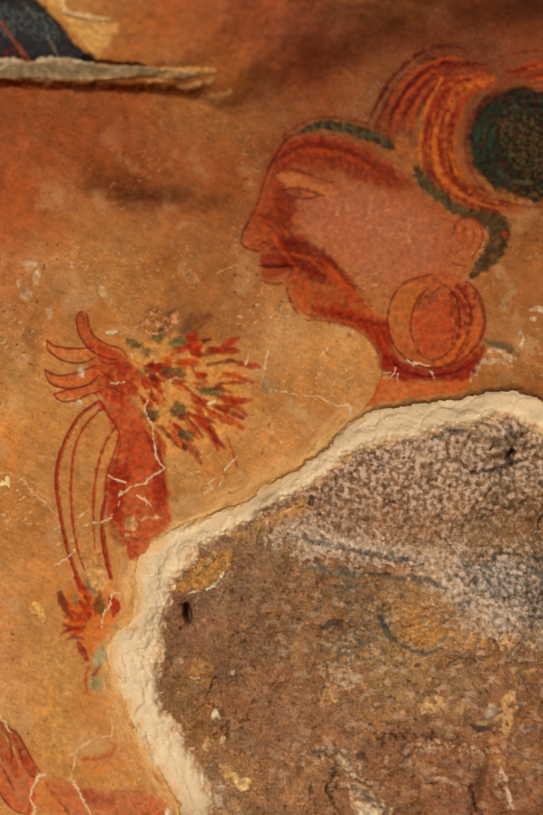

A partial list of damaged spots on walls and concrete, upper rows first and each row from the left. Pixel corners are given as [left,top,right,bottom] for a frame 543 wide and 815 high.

peeling [0,0,234,102]
crack [129,352,156,360]
crack [0,471,55,513]
crack [53,399,166,567]
crack [203,455,239,495]
peeling [123,513,164,542]
spalling [158,414,543,815]
crack [68,719,115,815]
crack [29,772,47,815]